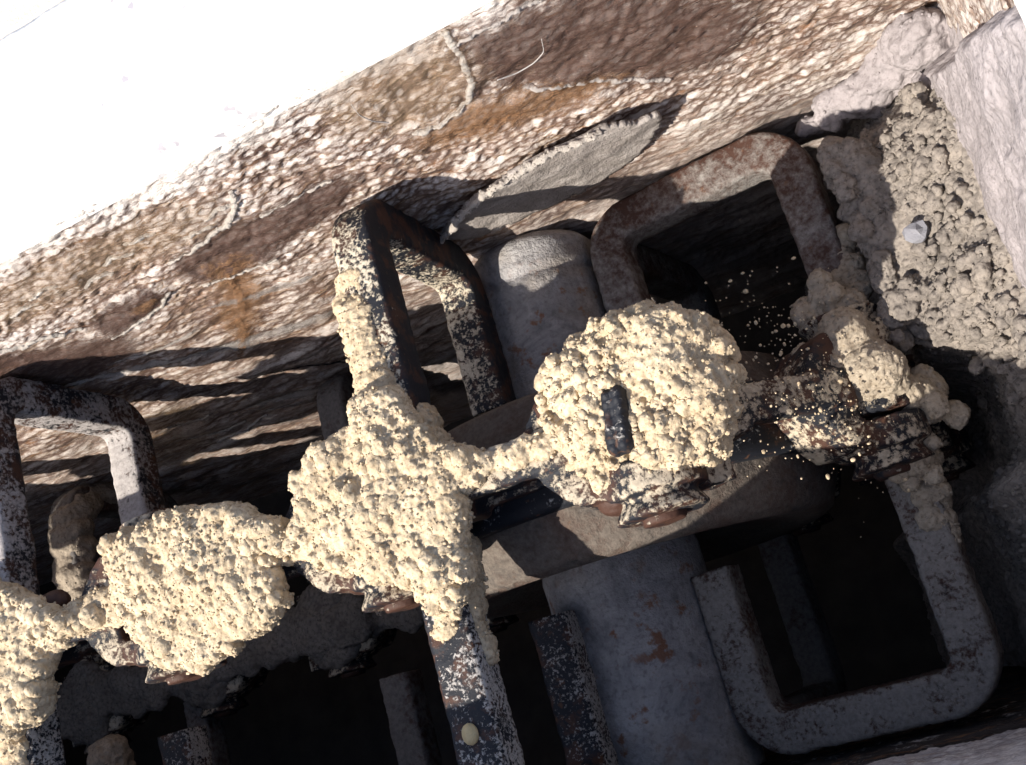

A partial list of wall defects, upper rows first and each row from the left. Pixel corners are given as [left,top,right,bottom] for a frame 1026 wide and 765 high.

spalling [167,175,365,287]
peeling [84,232,156,289]
peeling [10,284,58,319]
spalling [0,291,172,387]
spalling [601,384,635,457]
spalling [597,502,623,517]
spalling [43,589,72,606]